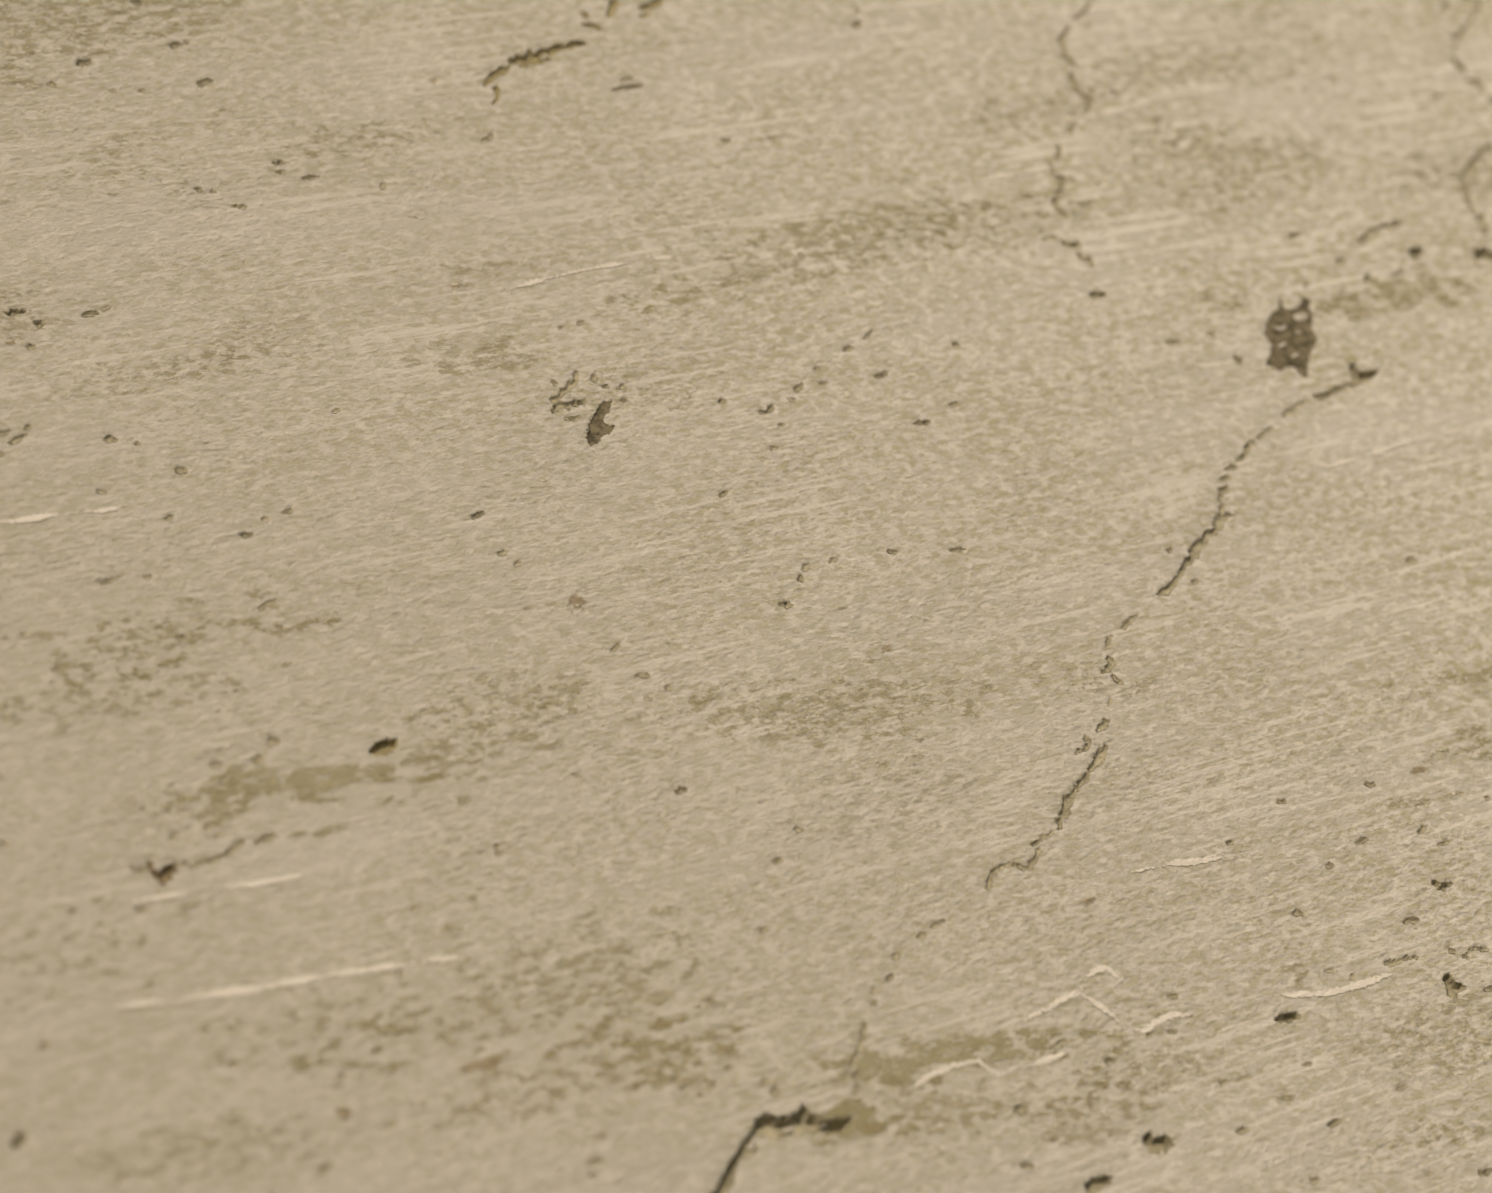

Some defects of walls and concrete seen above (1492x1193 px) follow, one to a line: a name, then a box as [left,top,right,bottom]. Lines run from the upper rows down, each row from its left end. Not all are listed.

crack [483,0,663,106]
crack [1451,0,1492,101]
crack [1049,3,1095,268]
crack [1460,143,1492,235]
spalling [1264,281,1318,378]
crack [986,363,1380,889]
crack [1384,946,1490,966]
crack [713,918,946,1193]